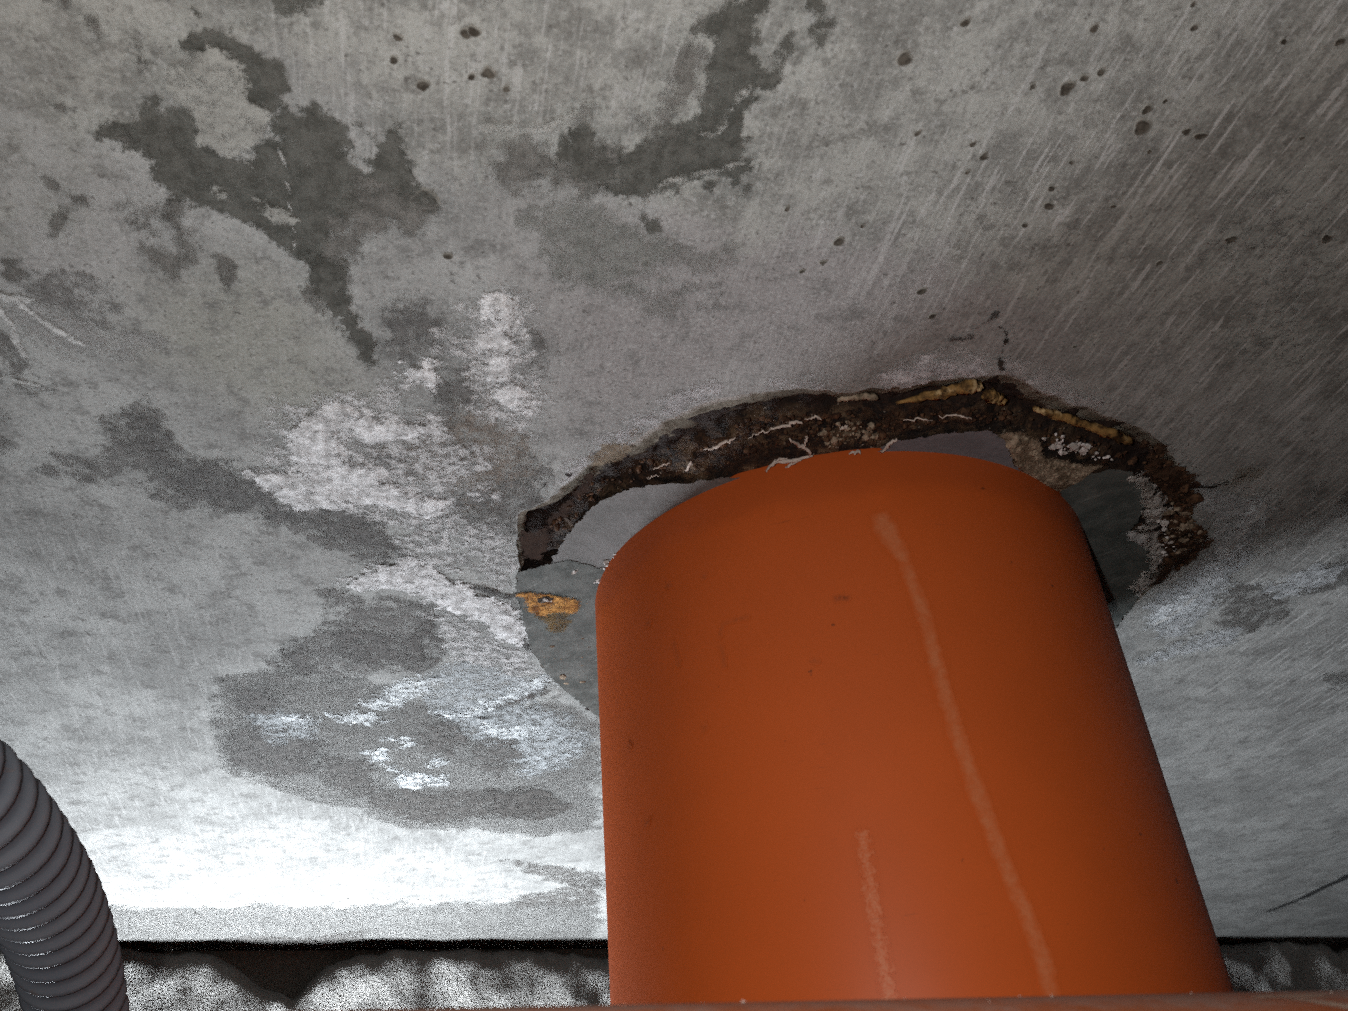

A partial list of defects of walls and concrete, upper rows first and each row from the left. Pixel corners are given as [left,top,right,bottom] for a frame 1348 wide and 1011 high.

leakage [764,345,1112,408]
leakage [35,284,723,838]
rust [514,592,580,634]
rust [1139,439,1215,588]